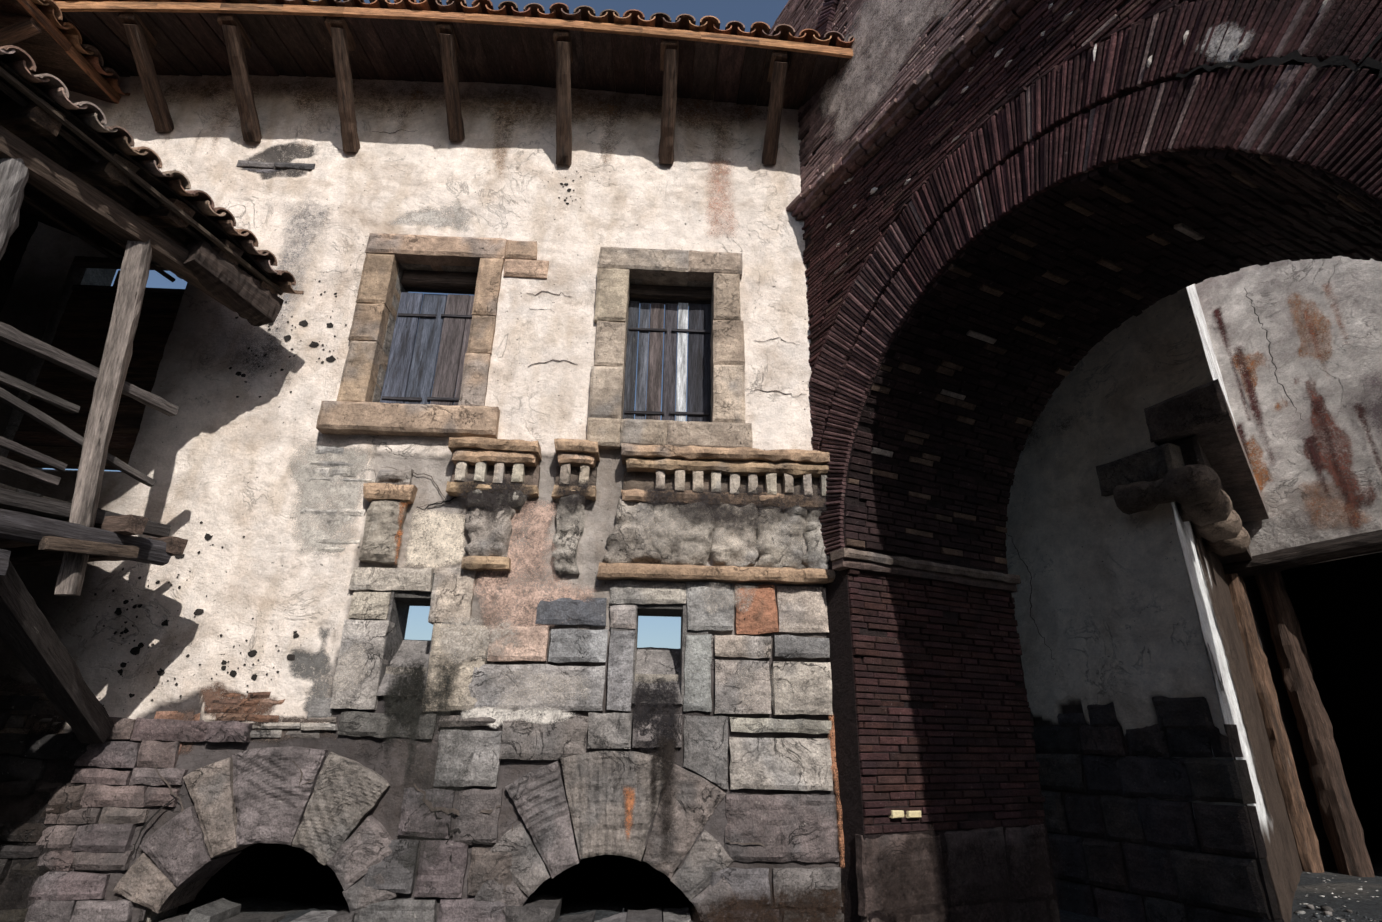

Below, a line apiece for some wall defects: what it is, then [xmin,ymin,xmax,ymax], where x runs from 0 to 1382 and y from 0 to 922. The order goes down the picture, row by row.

spalling [236,143,315,179]
corrosion [1288,285,1343,359]
corrosion [1213,308,1287,491]
corrosion [1295,381,1382,529]
spalling [125,739,194,755]
damp [384,661,458,775]
damp [632,678,681,856]